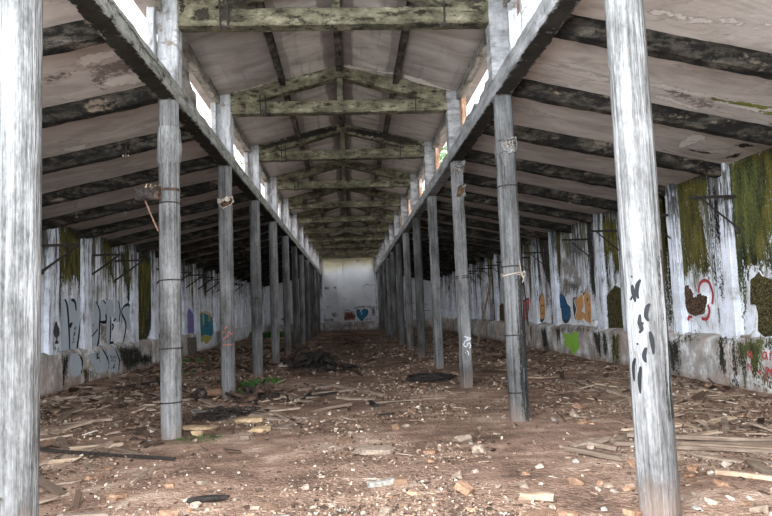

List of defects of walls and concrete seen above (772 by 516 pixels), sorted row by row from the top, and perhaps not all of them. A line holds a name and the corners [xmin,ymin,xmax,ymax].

leakage [179,0,209,21]
leakage [403,75,451,91]
leakage [678,135,758,173]
leakage [683,177,725,298]
spalling [684,284,709,317]
spalling [744,270,772,338]
leakage [717,309,772,392]